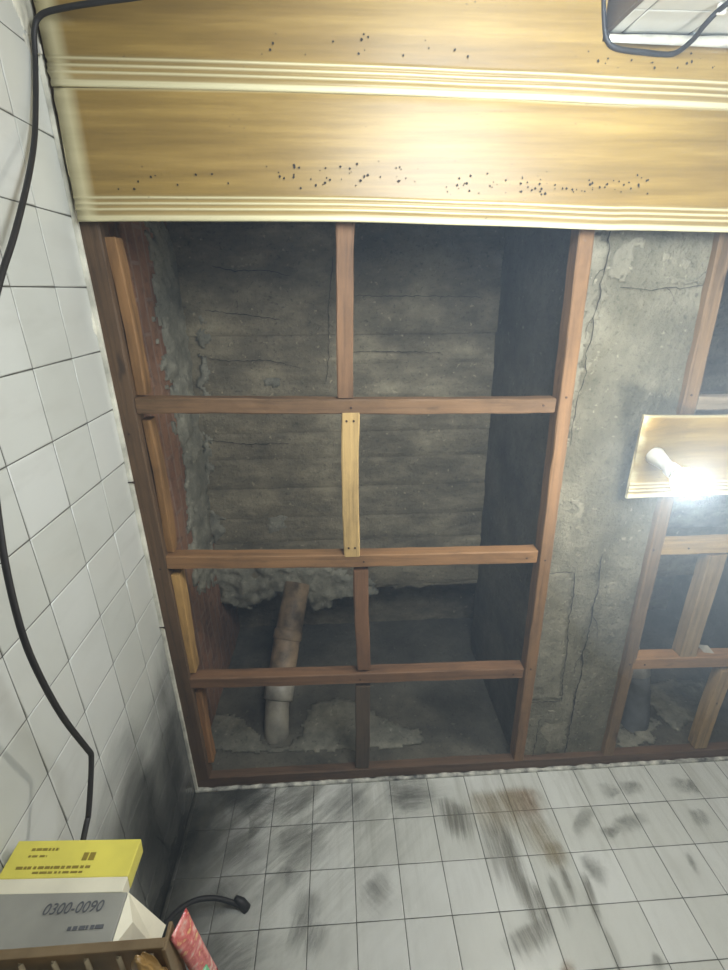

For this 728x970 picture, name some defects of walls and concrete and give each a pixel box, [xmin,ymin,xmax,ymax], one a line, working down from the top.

peeling [144,221,195,396]
peeling [171,413,214,550]
crack [532,554,603,756]